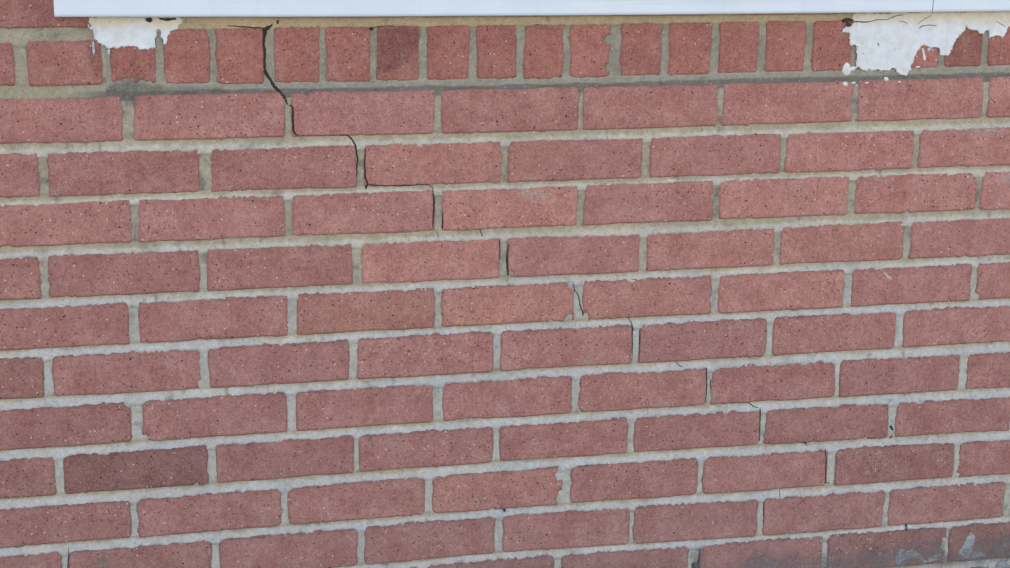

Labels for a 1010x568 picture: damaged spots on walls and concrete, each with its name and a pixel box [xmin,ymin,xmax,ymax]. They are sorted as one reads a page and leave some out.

peeling [88,17,183,56]
peeling [843,11,1010,76]
crack [227,24,443,238]
crack [480,230,510,286]
crack [628,316,641,360]